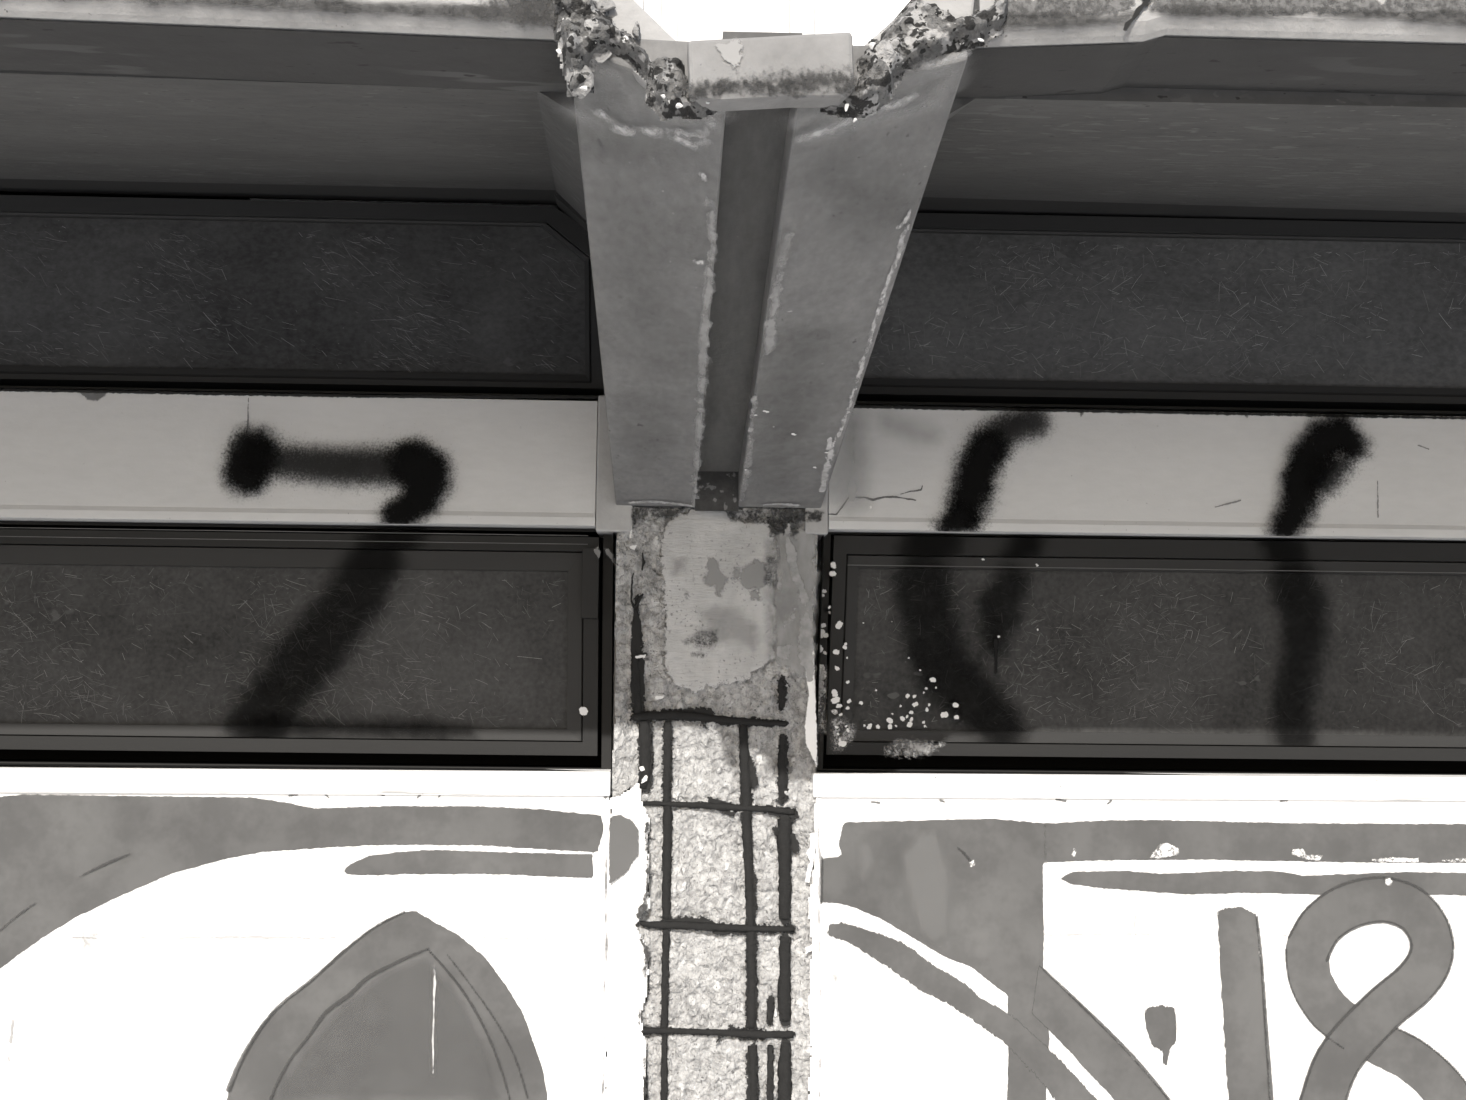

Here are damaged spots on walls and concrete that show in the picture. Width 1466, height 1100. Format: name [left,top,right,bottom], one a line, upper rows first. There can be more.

crack [1123,0,1150,31]
spalling [551,0,717,121]
spalling [820,0,1008,122]
water stain [631,507,684,525]
water stain [727,507,824,537]
water stain [704,557,773,601]
spalling [594,209,819,1100]